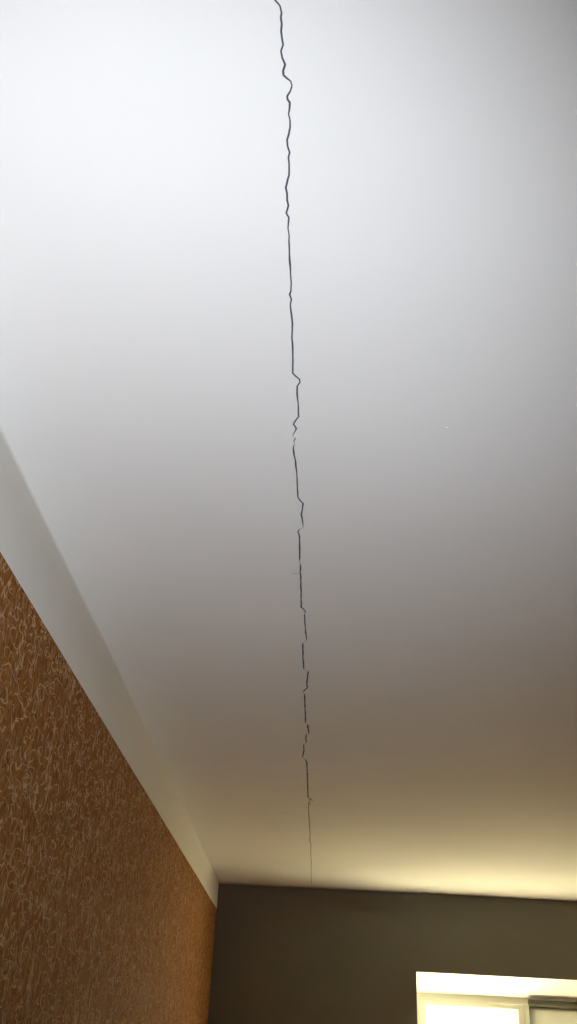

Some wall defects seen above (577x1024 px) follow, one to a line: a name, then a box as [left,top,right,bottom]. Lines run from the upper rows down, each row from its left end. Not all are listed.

crack [274,0,313,884]